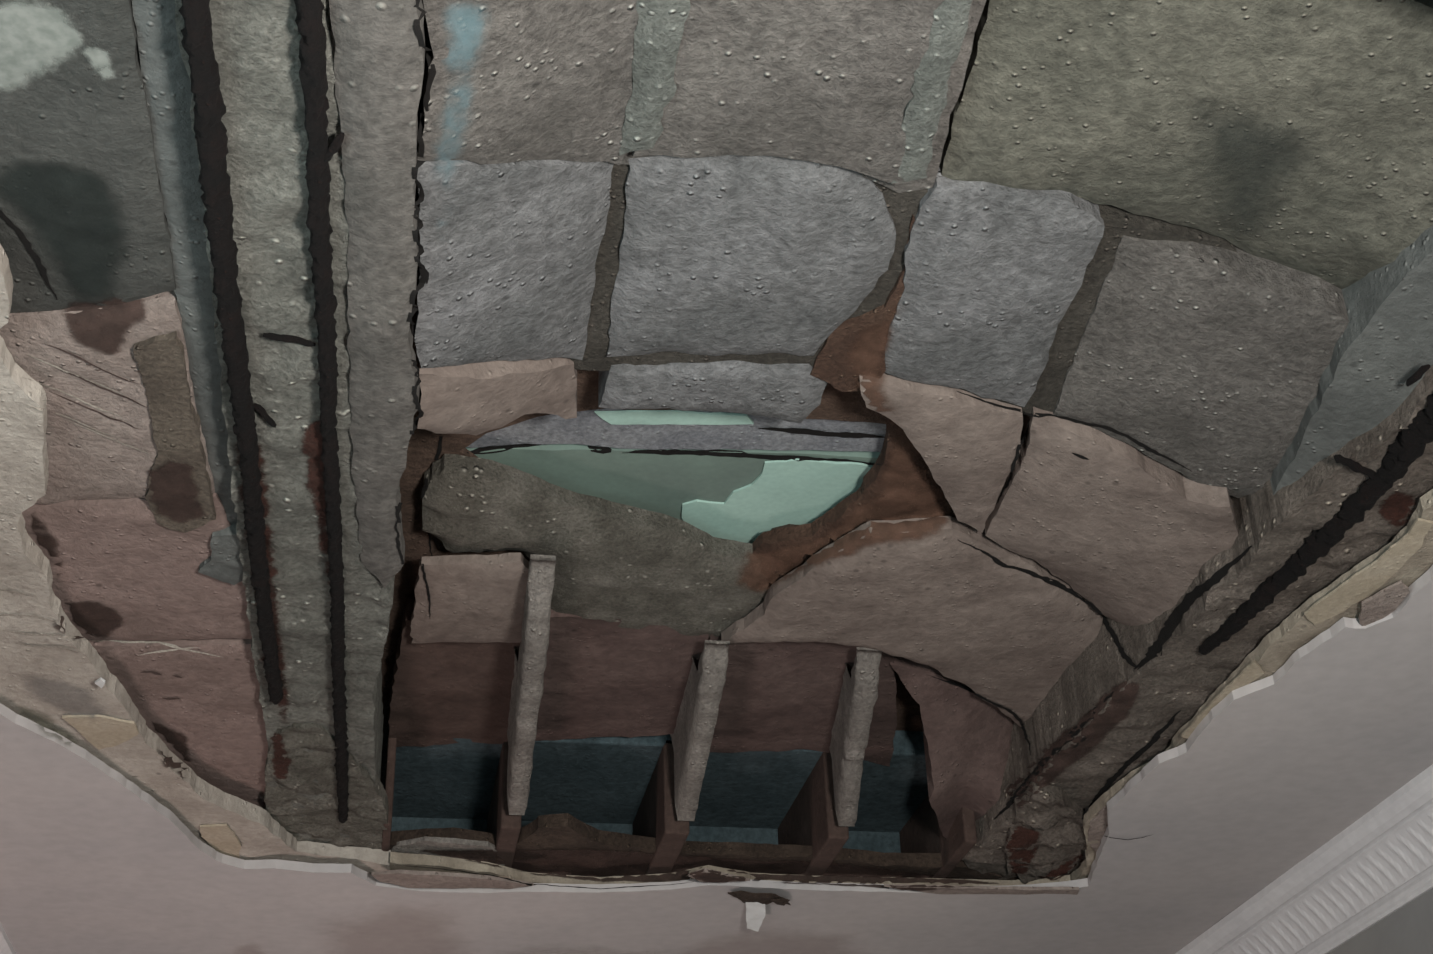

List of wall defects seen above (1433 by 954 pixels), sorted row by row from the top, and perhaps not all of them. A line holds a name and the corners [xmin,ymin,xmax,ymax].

crack [0,210,58,300]
water stain [0,164,145,355]
spalling [179,0,283,705]
spalling [294,0,349,823]
flaking render [0,244,1149,932]
crack [958,391,1192,504]
flaking render [1164,489,1433,752]
spalling [1198,394,1433,655]